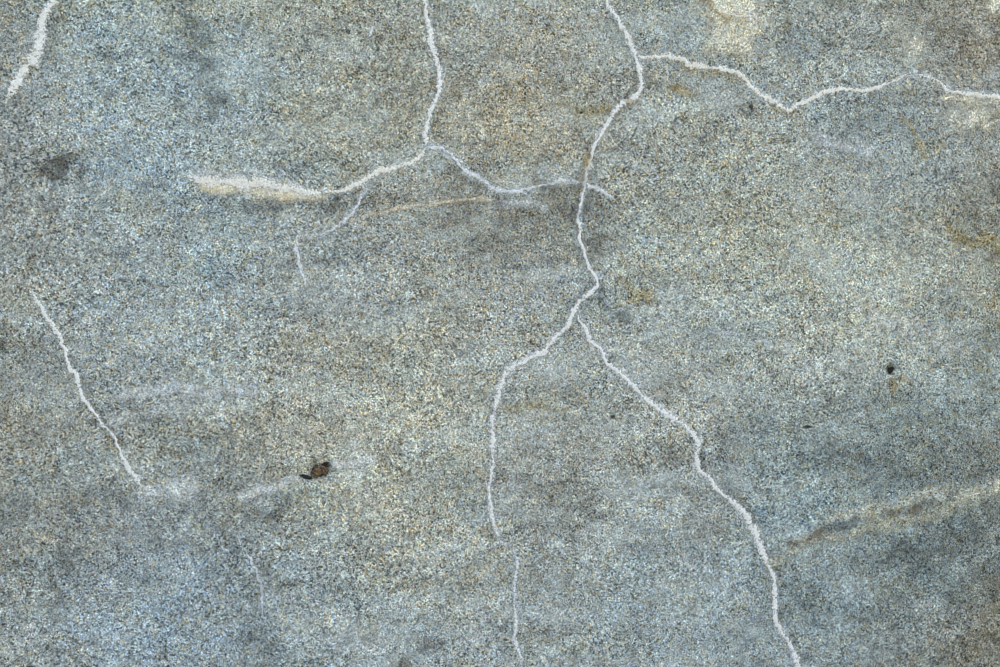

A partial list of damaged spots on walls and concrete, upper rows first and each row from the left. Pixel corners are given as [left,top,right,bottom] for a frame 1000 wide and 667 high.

crack [5,0,59,108]
crack [184,0,583,235]
crack [29,290,142,487]
crack [293,234,306,284]
crack [486,0,1000,667]
crack [225,507,264,614]